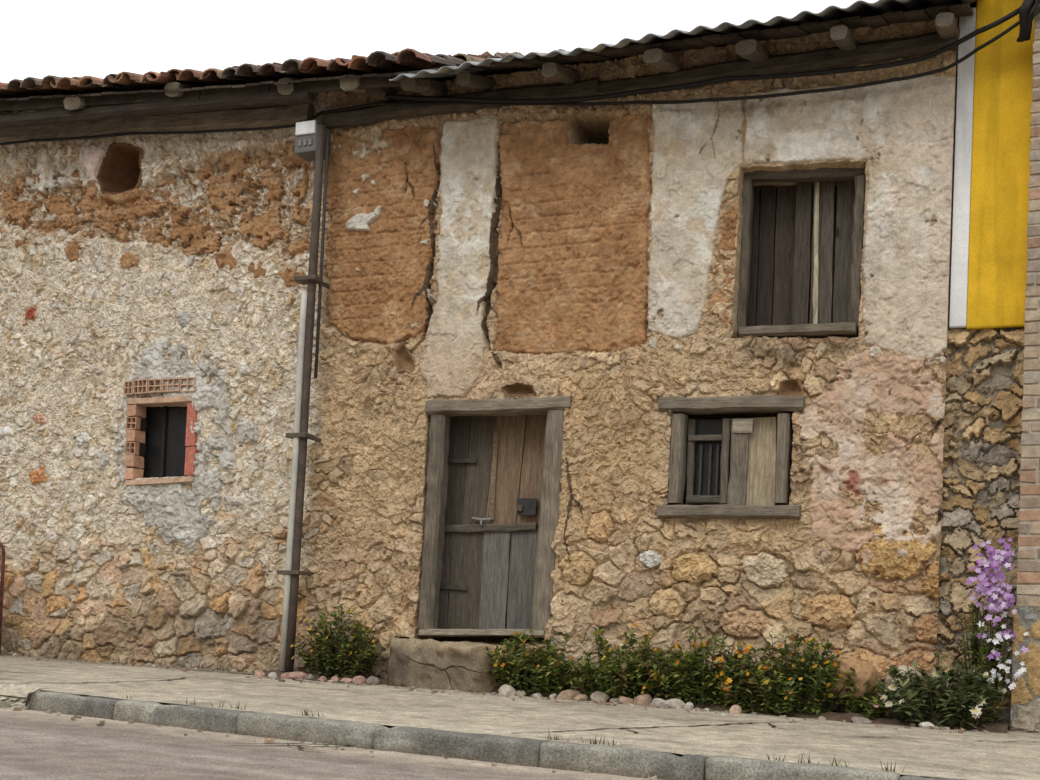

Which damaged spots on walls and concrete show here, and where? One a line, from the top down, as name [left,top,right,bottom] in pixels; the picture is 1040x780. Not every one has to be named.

spalling [0,141,311,288]
flaking render [95,310,260,552]
spalling [326,75,955,567]